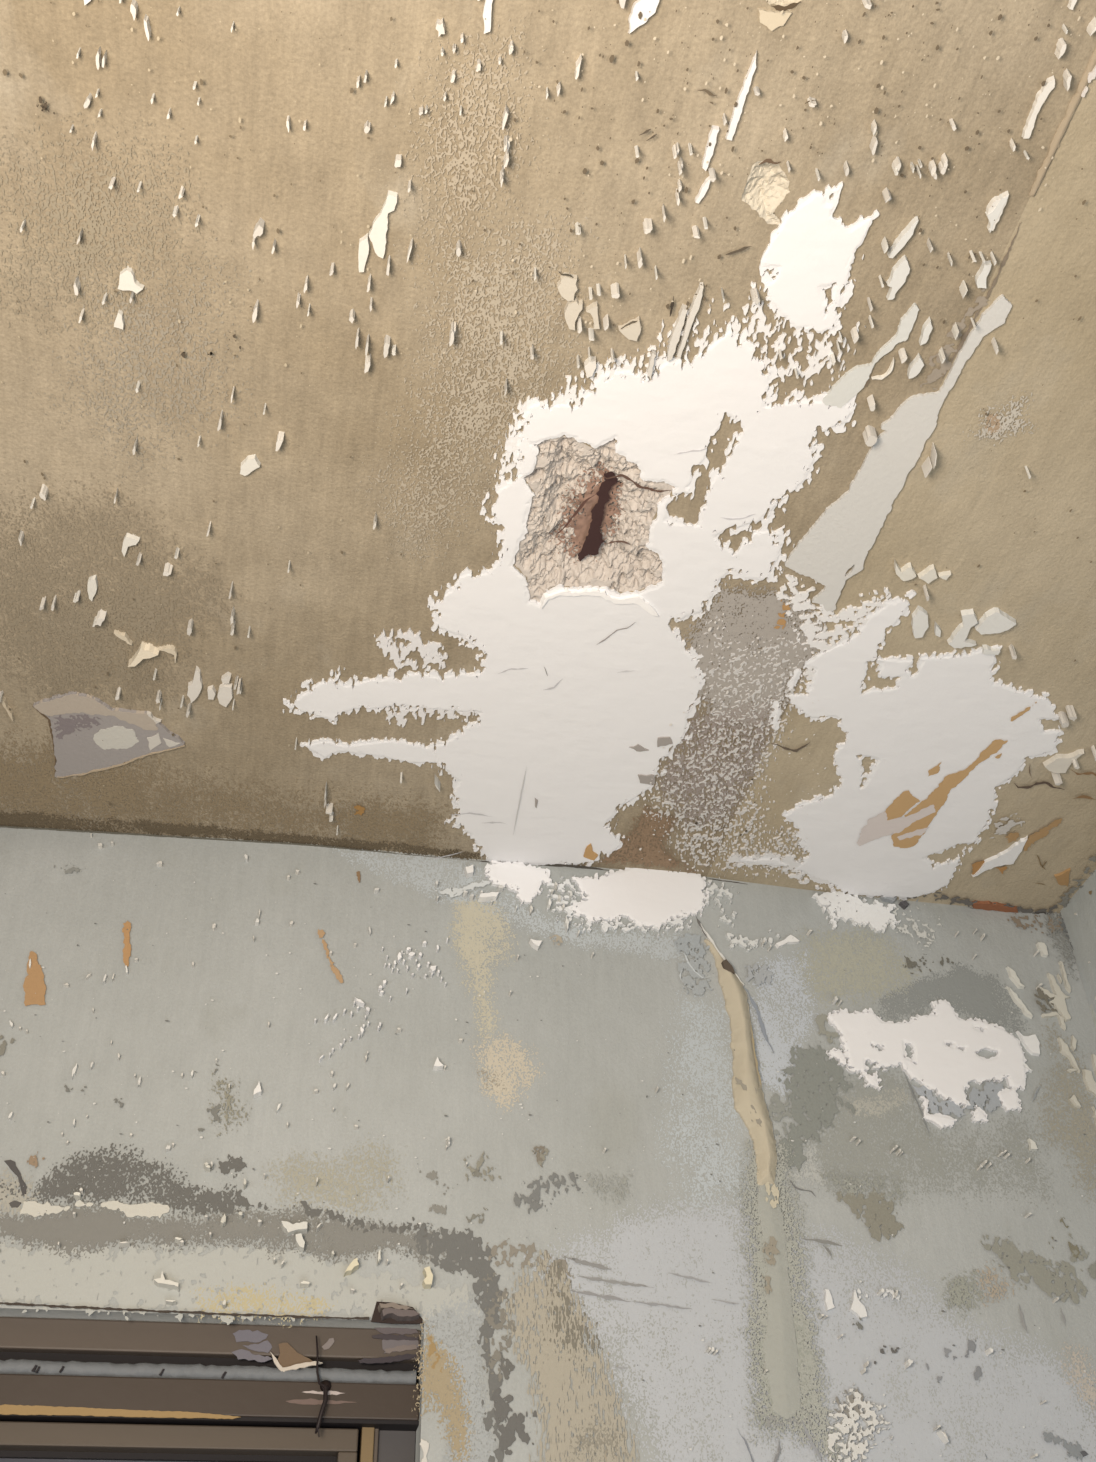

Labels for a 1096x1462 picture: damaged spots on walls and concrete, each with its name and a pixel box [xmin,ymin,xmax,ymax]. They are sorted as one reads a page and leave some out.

peeling [628,0,659,34]
spalling [742,161,790,225]
peeling [358,190,398,272]
peeling [886,216,918,300]
rust [548,461,627,565]
spalling [514,436,674,602]
rust [23,951,46,1006]
rust [122,921,131,967]
rust [318,929,343,983]
damp [198,1064,252,1137]
damp [0,1132,501,1237]
damp [514,1146,634,1214]